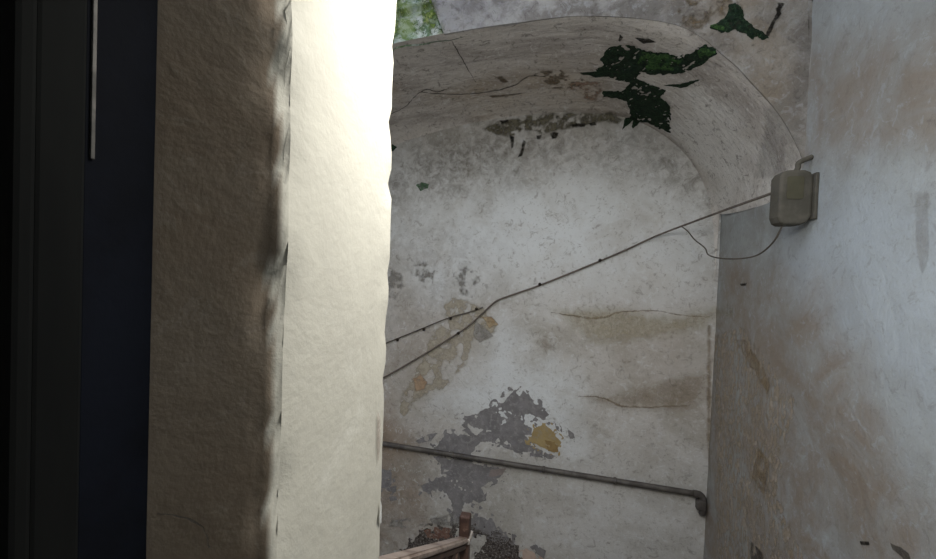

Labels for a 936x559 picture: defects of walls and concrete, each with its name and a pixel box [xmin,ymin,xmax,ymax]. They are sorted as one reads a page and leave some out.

peeling [535,70,585,89]
peeling [400,267,498,416]
peeling [399,386,575,559]